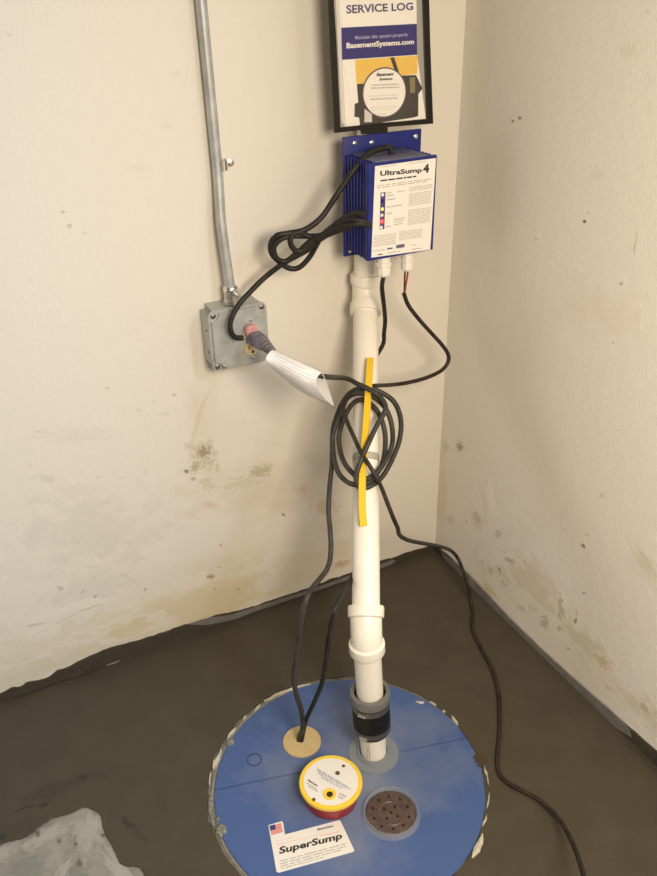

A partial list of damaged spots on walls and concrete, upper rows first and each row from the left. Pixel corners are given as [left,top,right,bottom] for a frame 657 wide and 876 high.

leakage [0,453,352,693]
leakage [379,507,413,561]
leakage [445,507,657,739]